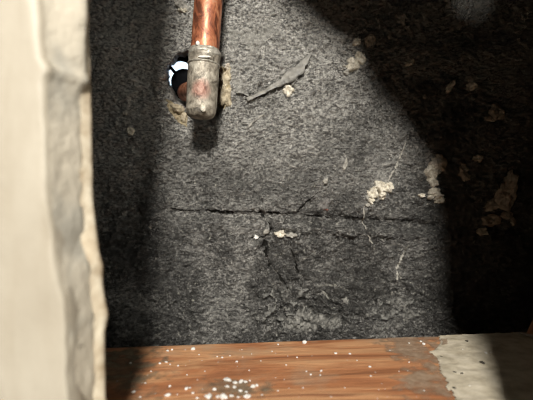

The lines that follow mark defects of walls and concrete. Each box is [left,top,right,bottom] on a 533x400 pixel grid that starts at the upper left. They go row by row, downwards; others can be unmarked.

flaking render [365,180,394,207]
flaking render [418,153,447,204]
crack [171,192,373,294]